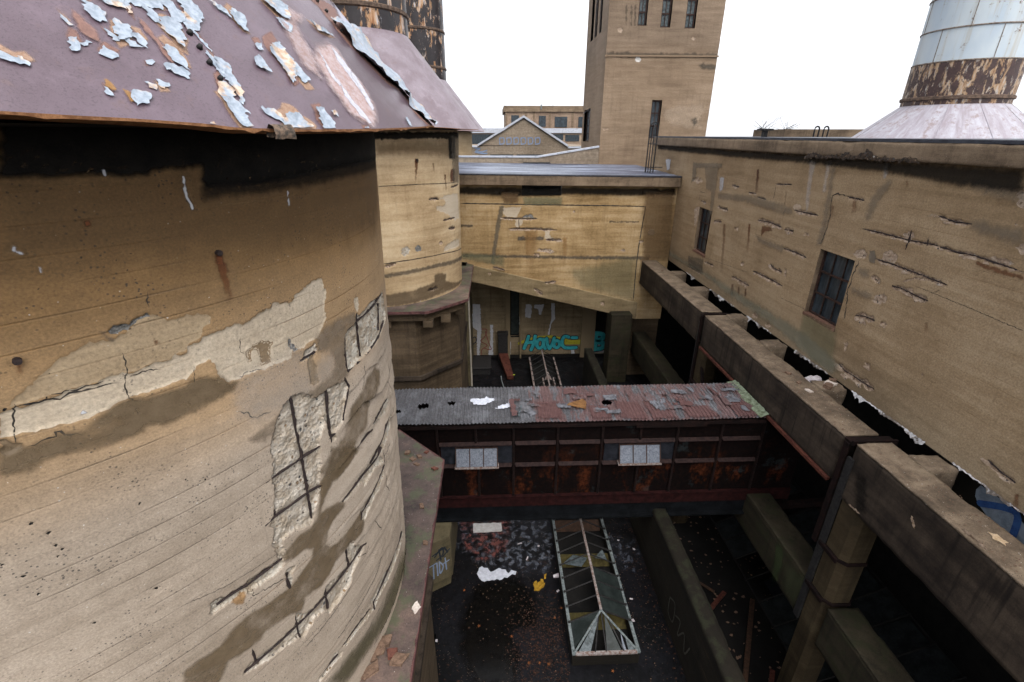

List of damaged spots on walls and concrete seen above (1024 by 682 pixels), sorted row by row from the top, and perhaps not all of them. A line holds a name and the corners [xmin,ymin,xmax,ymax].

peeling [0,45,33,66]
peeling [60,0,338,129]
peeling [308,0,438,126]
rust [215,250,228,284]
peeling [500,207,562,257]
crack [12,353,160,447]
damp [0,378,236,474]
peeling [0,278,392,615]
damp [306,314,356,398]
spalling [794,350,925,445]
damp [185,368,380,682]
spalling [244,541,367,674]